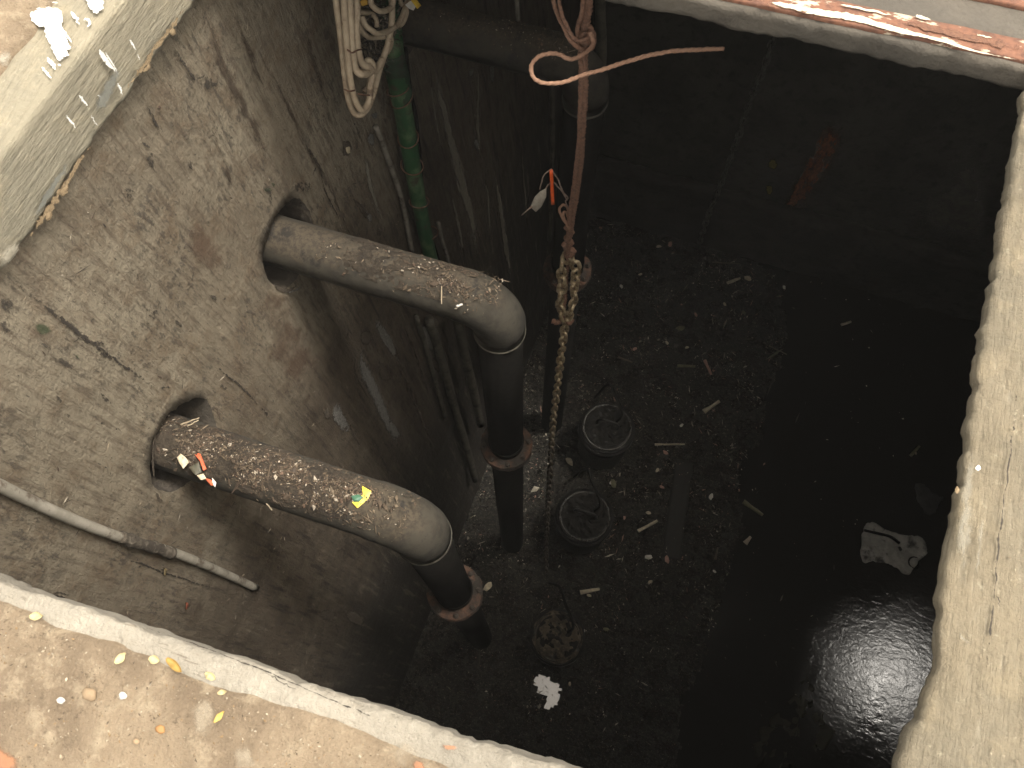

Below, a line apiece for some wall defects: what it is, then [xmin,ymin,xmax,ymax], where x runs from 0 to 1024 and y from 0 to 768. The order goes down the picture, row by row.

peeling [773,2,992,55]
crack [20,286,170,389]
crack [987,396,1017,660]